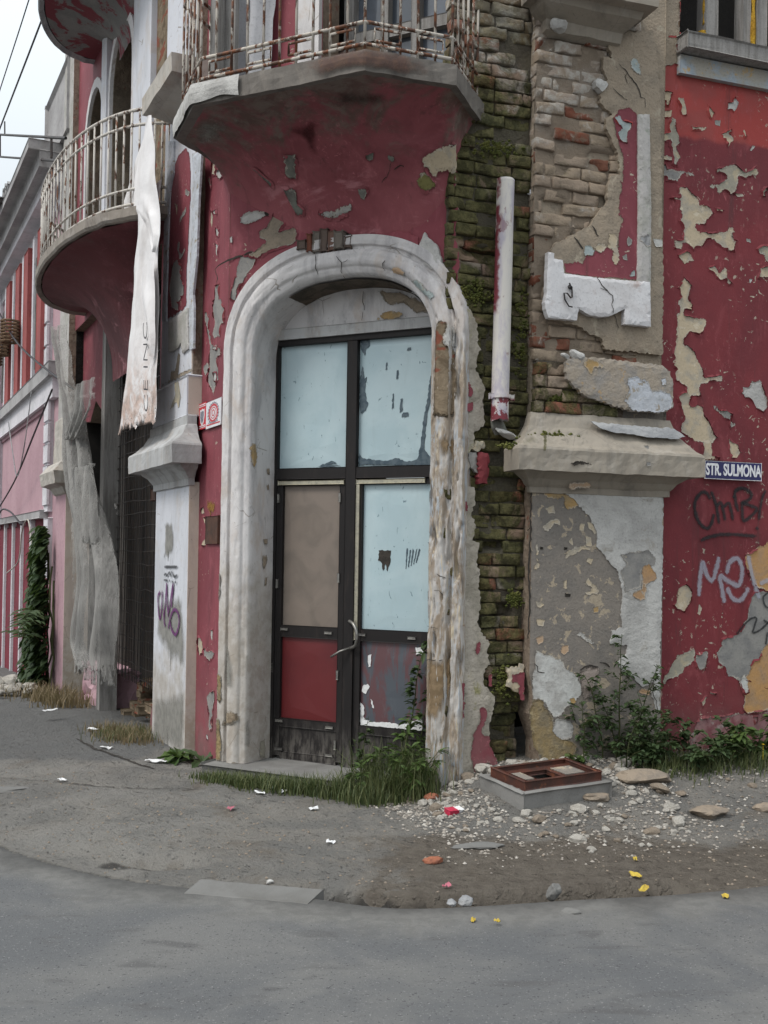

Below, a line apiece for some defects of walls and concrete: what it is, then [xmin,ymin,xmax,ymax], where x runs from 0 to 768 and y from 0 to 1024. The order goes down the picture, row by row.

spalling [592,78,608,94]
peeling [162,155,370,413]
peeling [584,89,768,461]
peeling [528,601,600,760]
peeling [543,482,591,531]
peeling [564,522,598,564]
peeling [621,550,657,601]
peeling [663,542,768,751]